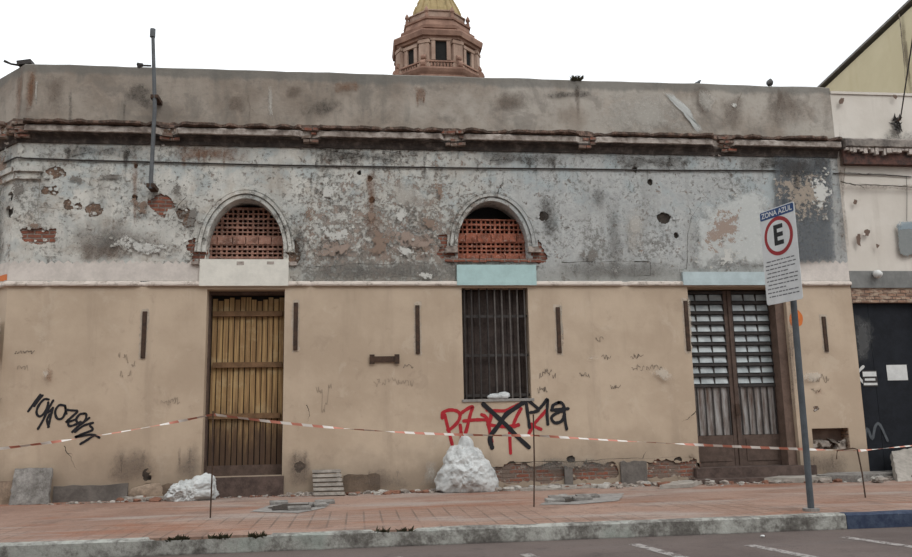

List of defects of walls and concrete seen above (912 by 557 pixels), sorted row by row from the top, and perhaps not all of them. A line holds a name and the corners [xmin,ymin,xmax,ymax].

flaking render [0,142,57,245]
spalling [41,166,122,217]
spalling [109,179,208,261]
spalling [284,235,301,263]
peeling [302,171,365,264]
peeling [380,168,455,261]
spalling [657,213,676,226]
peeling [695,207,747,270]
peeling [773,167,835,222]
flaking render [495,456,618,486]
flaking render [647,454,701,481]